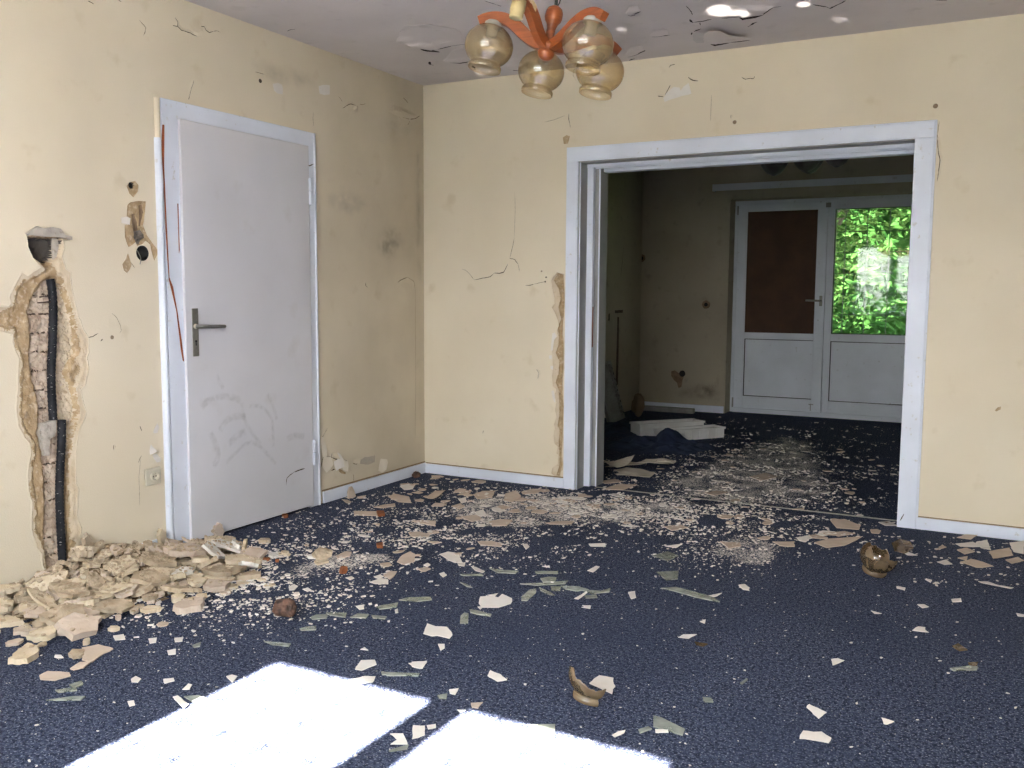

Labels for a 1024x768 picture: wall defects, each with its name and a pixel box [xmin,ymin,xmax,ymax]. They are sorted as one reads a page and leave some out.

crack [173,17,219,36]
peeling [396,24,463,65]
peeling [685,0,781,46]
flaking render [121,181,158,273]
crack [463,228,542,286]
flaking render [0,226,90,571]
flaking render [549,272,565,477]
peeling [320,437,388,474]